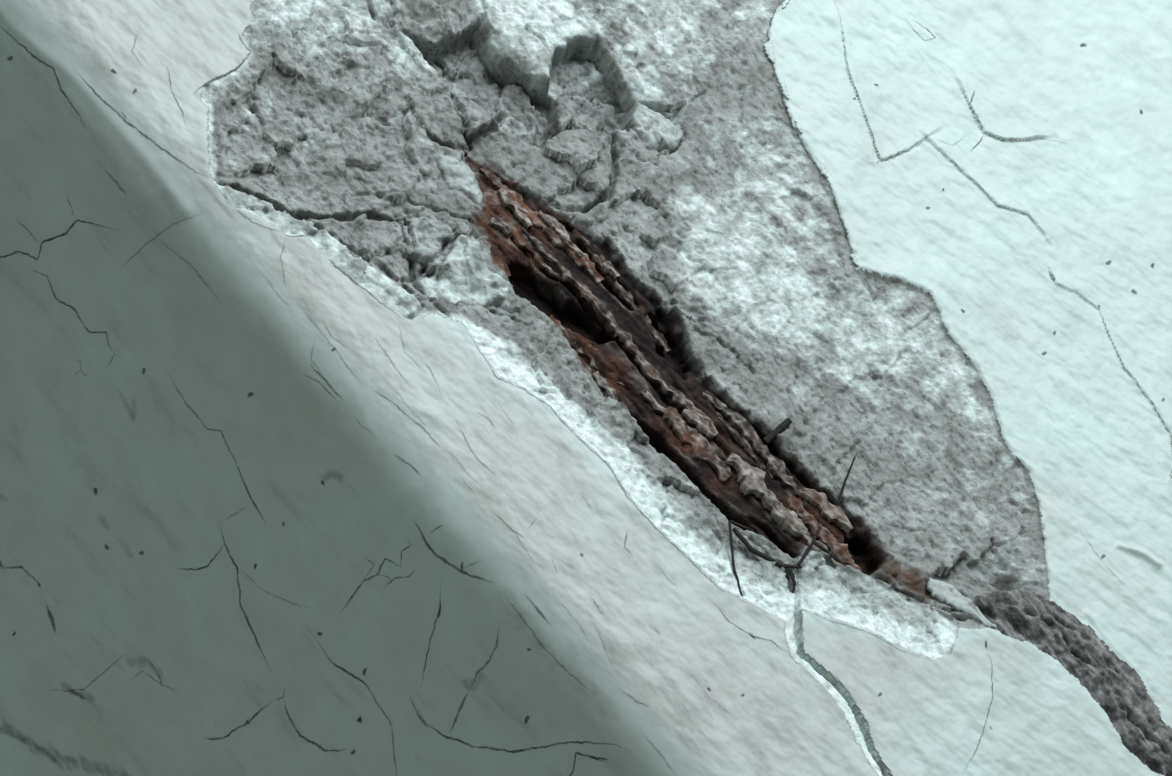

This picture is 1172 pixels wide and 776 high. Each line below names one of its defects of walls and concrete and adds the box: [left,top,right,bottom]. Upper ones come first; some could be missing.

crack [21,45,177,160]
crack [2,220,89,259]
spalling [200,0,1050,661]
rust [465,154,890,576]
crack [190,553,261,650]
crack [423,538,479,578]
crack [215,709,330,751]
crack [438,731,605,769]
crack [783,611,893,776]